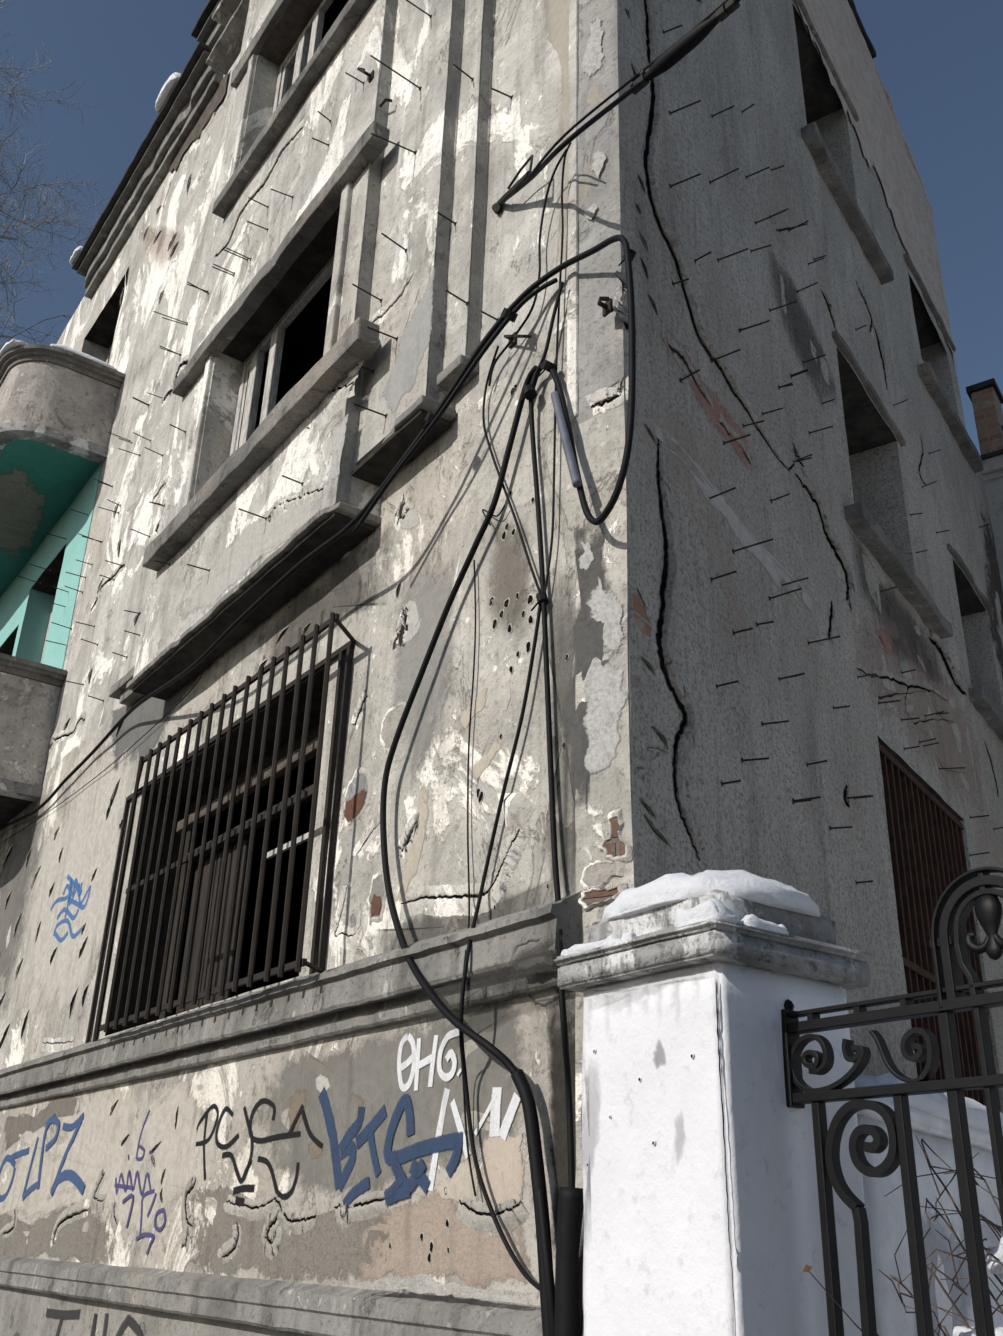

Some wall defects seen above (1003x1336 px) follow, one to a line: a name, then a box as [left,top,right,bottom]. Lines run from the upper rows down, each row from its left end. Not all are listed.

crack [585,376,629,416]
crack [613,0,1000,797]
peeling [579,541,656,774]
crack [656,439,707,861]
rust [344,790,366,822]
crack [329,812,420,951]
crack [400,828,529,921]
spalling [578,809,632,911]
peeling [0,1000,530,1302]
crack [0,1206,18,1238]
crack [51,1166,119,1246]
crack [454,1190,530,1236]